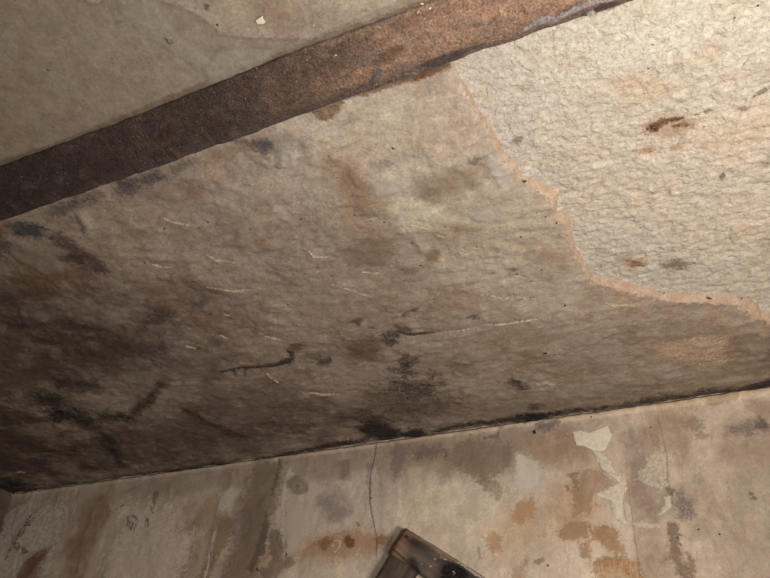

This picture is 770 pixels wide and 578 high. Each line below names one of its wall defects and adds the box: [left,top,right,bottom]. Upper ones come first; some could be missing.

corrosion [0,0,451,165]
corrosion [646,117,694,133]
mould [0,221,105,274]
water stain [31,380,163,426]
water stain [0,436,237,578]
crack [369,443,377,554]
water stain [248,333,770,578]
peeling [573,426,672,573]
peeling [707,393,739,406]